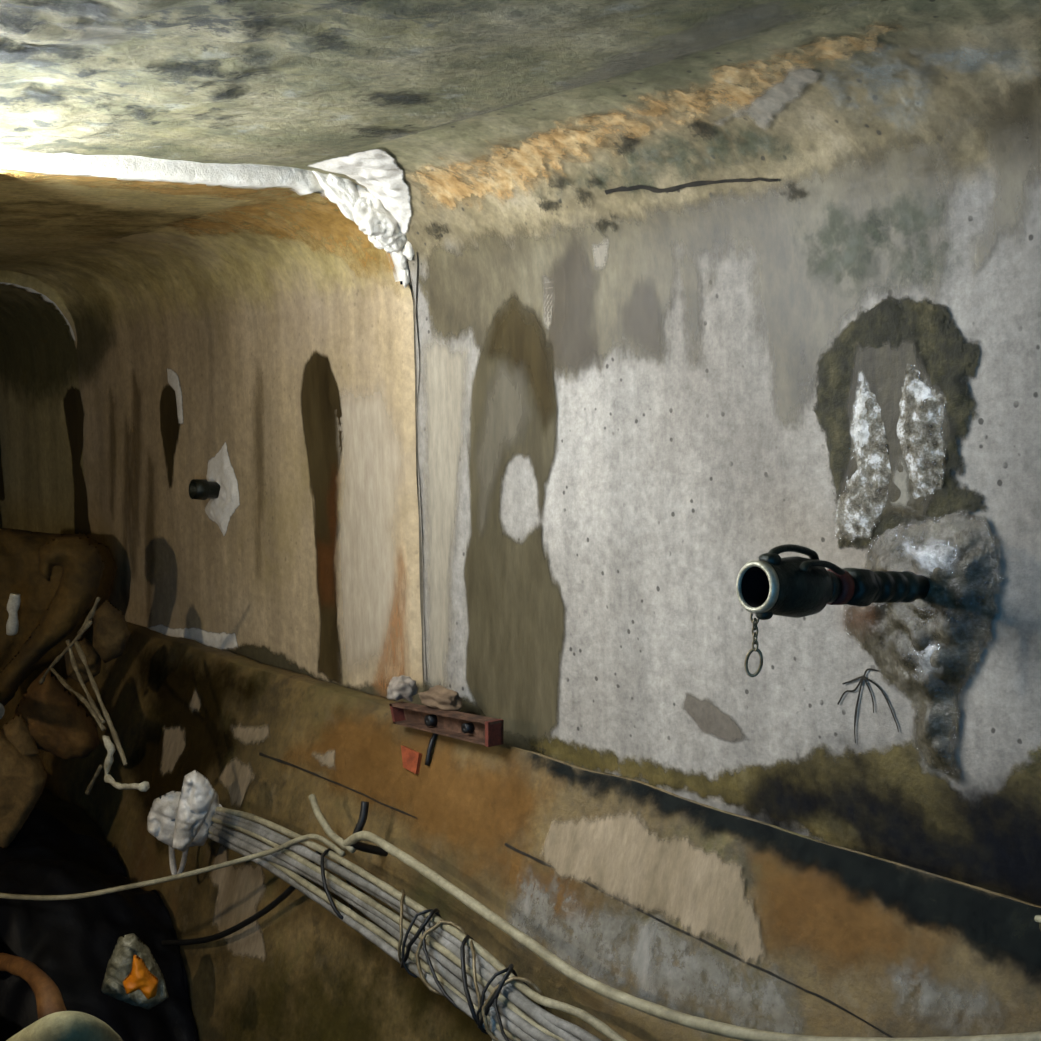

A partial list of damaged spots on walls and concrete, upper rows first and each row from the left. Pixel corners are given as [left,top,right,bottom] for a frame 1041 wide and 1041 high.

damp [131,69,1041,976]
crack [604,177,778,195]